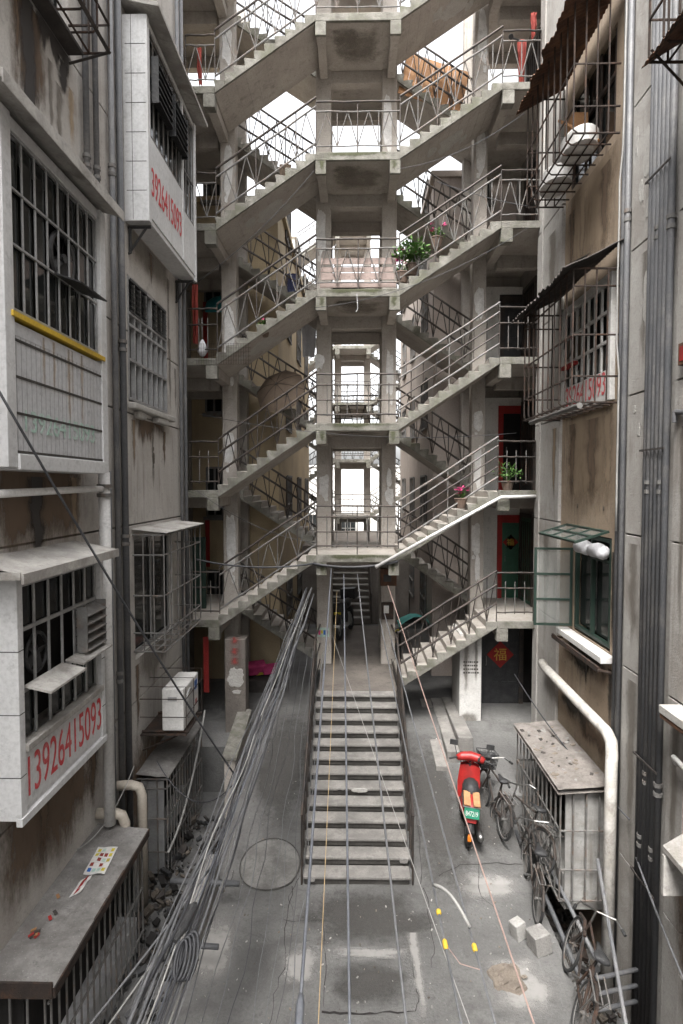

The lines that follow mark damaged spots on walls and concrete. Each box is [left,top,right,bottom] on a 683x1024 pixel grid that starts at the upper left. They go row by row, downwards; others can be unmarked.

leakage [132,419,165,463]
leakage [569,406,612,504]
leakage [0,471,80,552]